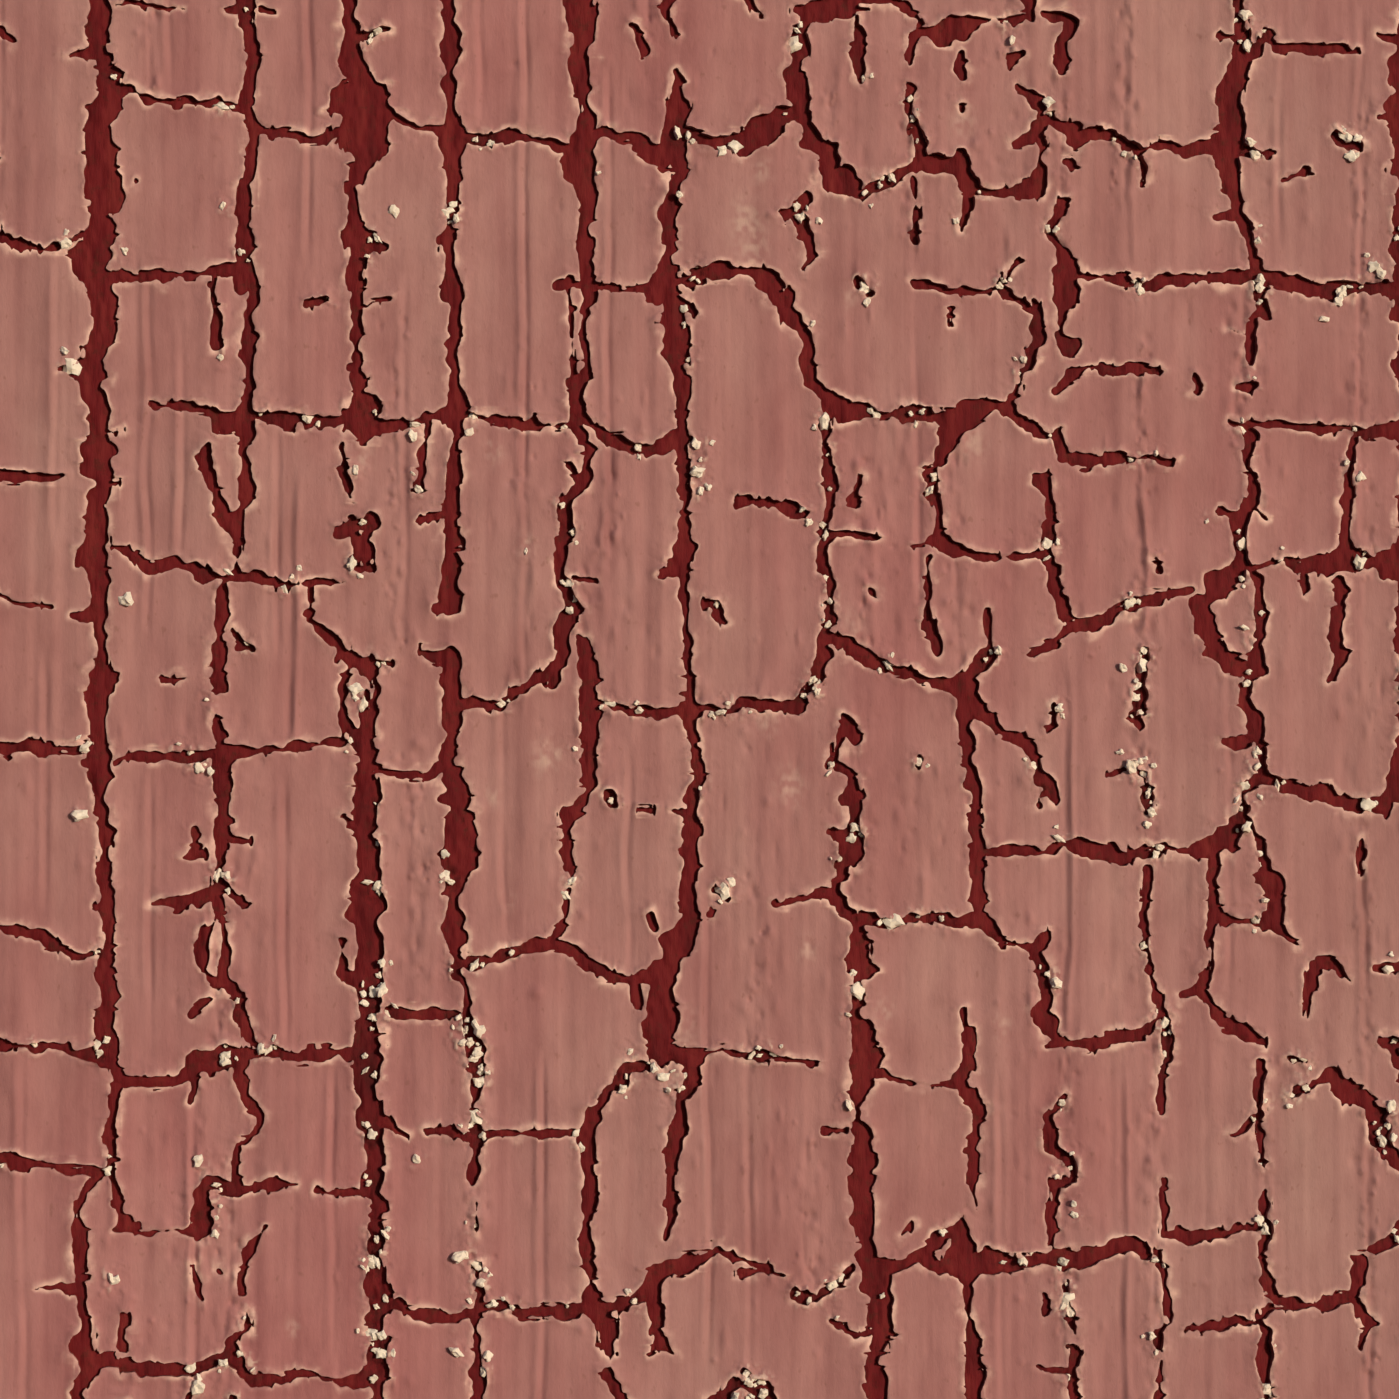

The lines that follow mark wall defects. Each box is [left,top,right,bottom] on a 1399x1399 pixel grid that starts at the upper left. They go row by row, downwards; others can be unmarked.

peeling [629,24,650,60]
peeling [953,51,967,81]
peeling [1005,35,1024,71]
peeling [1331,125,1363,162]
peeling [846,475,862,509]
peeling [700,597,727,626]
crack [0,0,823,1399]
crack [591,0,1399,1399]
peeling [1043,703,1065,733]
peeling [603,789,617,808]
peeling [646,911,658,932]
peeling [190,1264,204,1301]